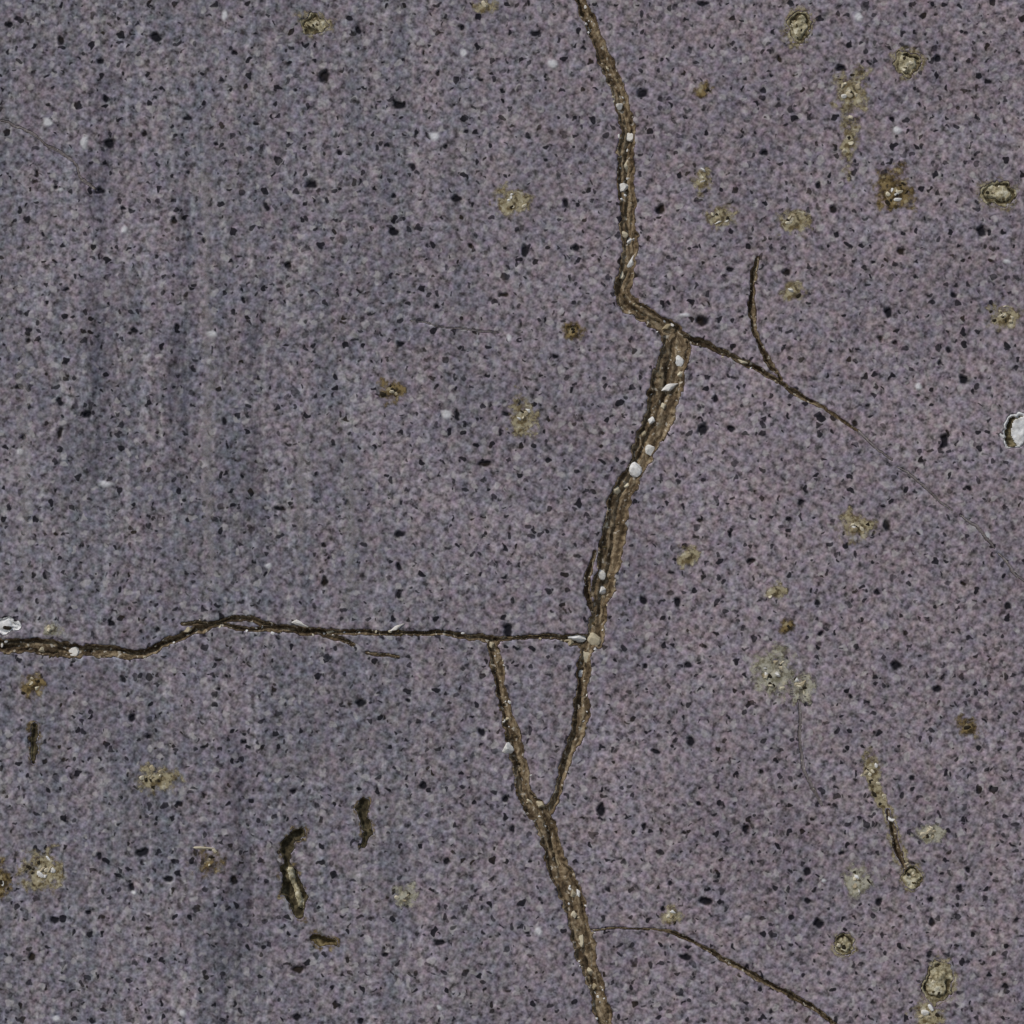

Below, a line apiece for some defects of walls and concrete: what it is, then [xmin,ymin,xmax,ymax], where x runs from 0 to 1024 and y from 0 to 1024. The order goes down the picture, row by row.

crack [0,119,97,191]
spalling [978,180,1018,212]
crack [410,320,499,333]
spalling [999,412,1024,449]
crack [487,0,893,1024]
crack [897,467,1024,582]
crack [0,615,588,660]
spalling [26,720,41,764]
spalling [354,797,375,848]
crack [886,809,908,871]
spalling [277,826,340,951]
spalling [921,958,957,1007]